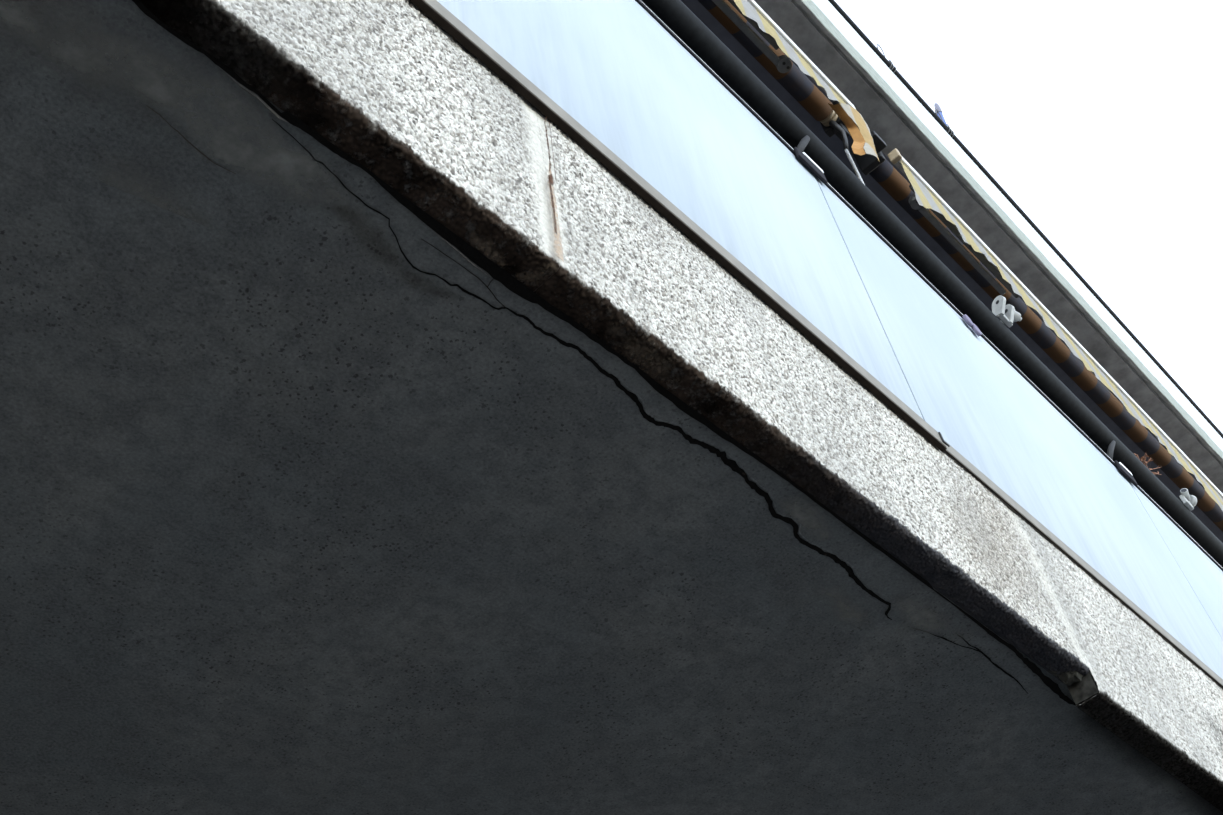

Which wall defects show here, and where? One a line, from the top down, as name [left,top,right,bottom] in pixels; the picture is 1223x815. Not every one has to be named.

crack [132,0,1076,706]